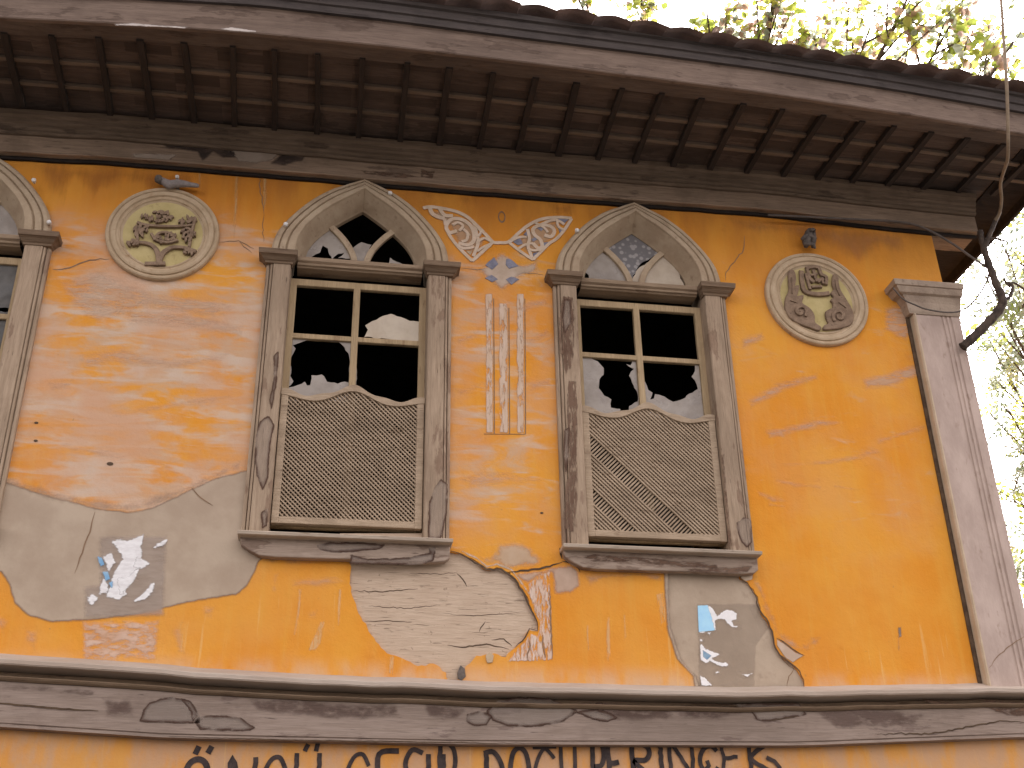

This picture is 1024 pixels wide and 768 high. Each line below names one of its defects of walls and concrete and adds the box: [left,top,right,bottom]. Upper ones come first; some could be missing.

crack [225,180,264,253]
crack [53,258,107,270]
crack [75,513,95,572]
flaking render [318,479,553,680]
flaking render [585,554,805,687]
peeling [140,697,255,731]
peeling [467,697,617,727]